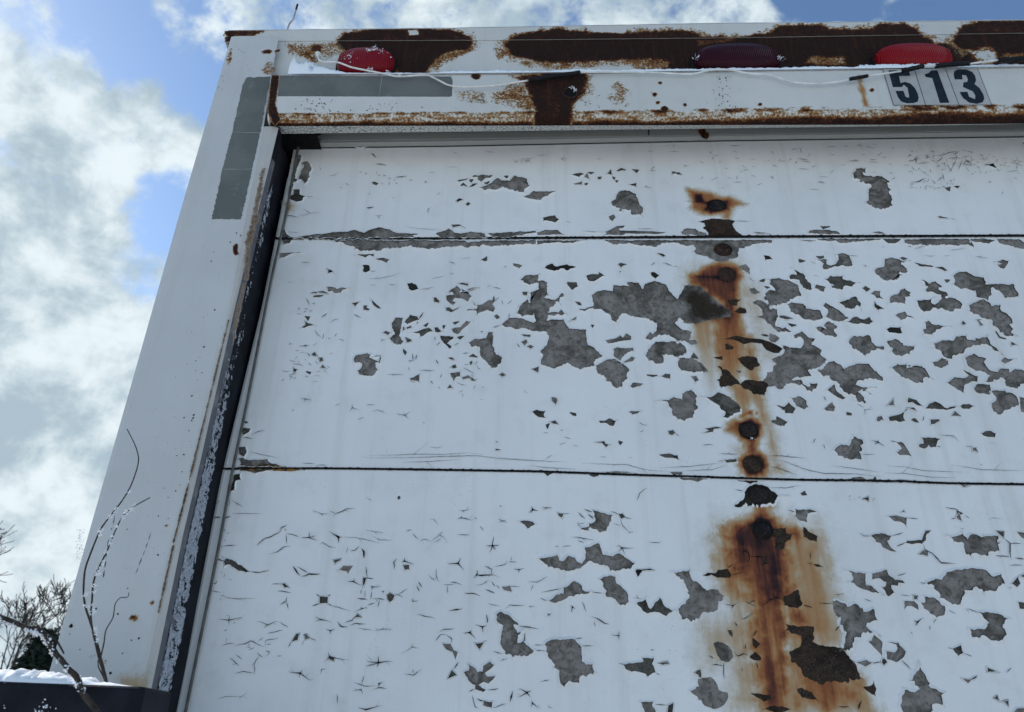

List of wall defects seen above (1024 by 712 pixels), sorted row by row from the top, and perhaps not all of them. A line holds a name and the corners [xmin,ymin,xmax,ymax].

rust [261,20,1024,139]
rust [686,187,745,220]
peeling [279,167,1024,462]
rust [686,260,784,478]
crack [212,490,619,711]
peeling [442,609,598,709]
peeling [537,509,731,625]
peeling [621,656,670,679]
peeling [687,669,728,709]
peeling [735,480,820,564]
rust [707,506,876,712]
peeling [783,510,1024,712]